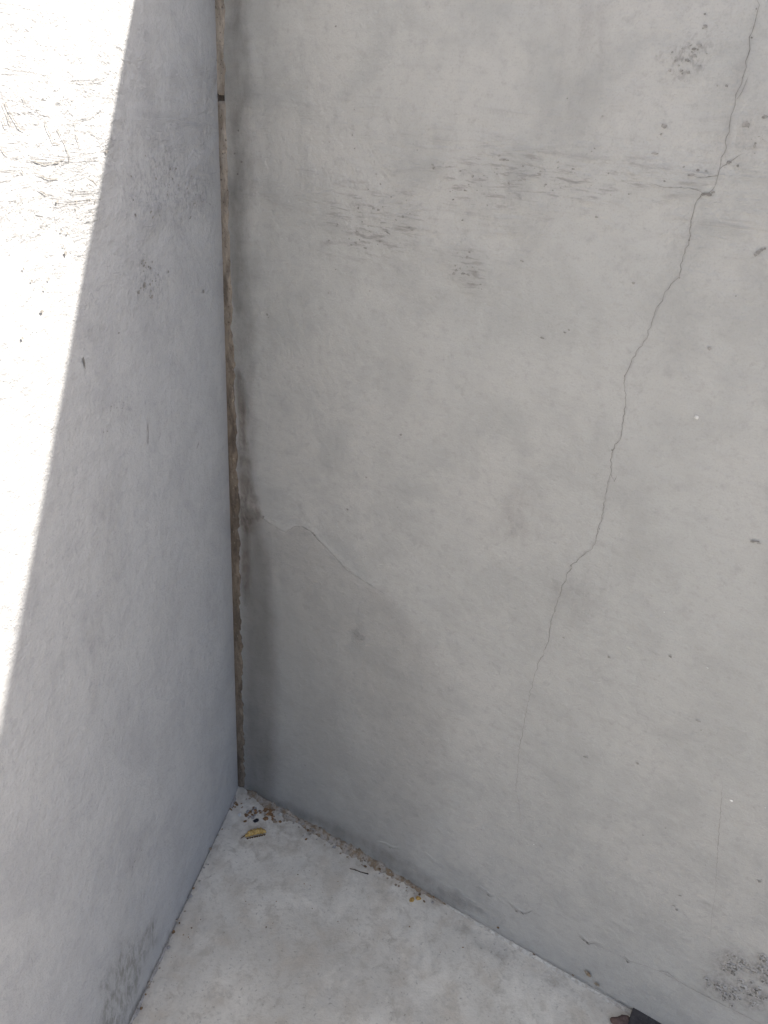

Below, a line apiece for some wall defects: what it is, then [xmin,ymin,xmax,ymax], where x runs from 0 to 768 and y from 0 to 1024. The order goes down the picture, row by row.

crack [517,7,759,801]